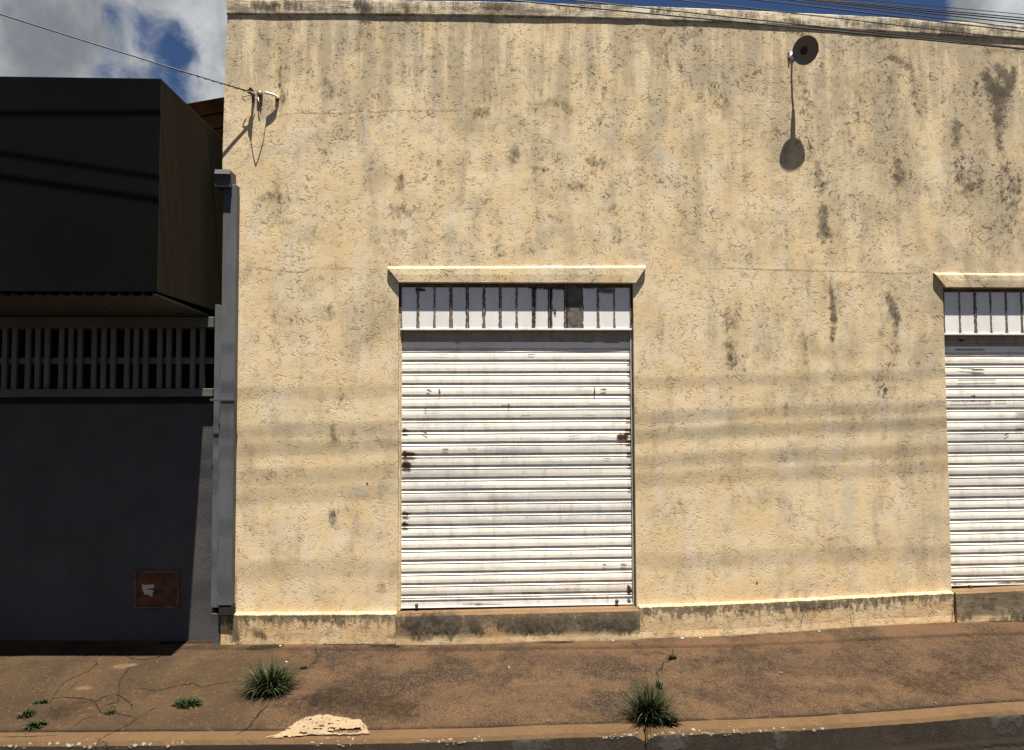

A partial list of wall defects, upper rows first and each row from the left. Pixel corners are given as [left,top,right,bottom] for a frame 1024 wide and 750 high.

leakage [976,64,1016,148]
leakage [818,205,829,236]
corrosion [617,418,631,467]
corrosion [402,450,417,468]
leakage [395,612,484,639]
leakage [497,614,640,633]
crack [11,646,233,745]